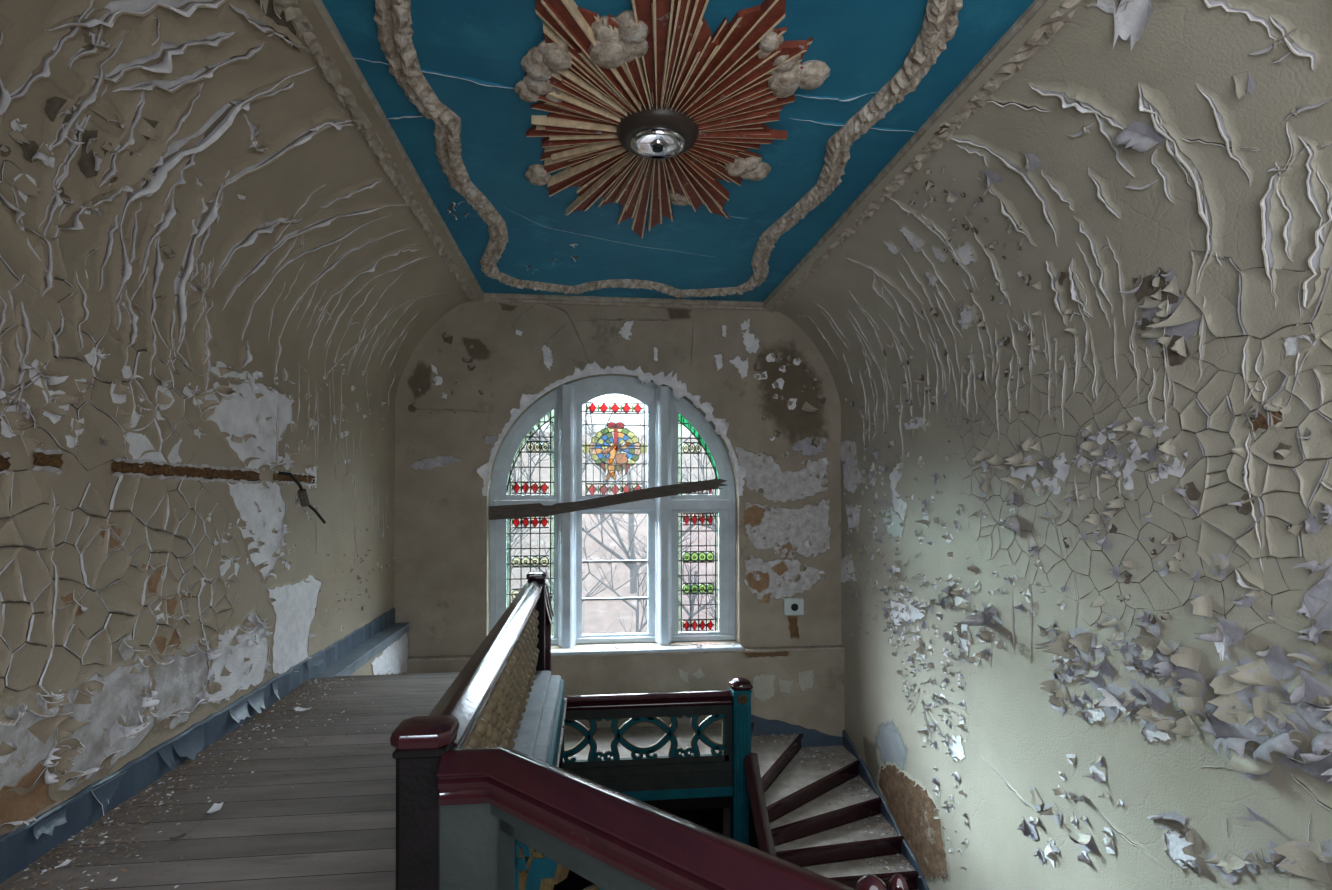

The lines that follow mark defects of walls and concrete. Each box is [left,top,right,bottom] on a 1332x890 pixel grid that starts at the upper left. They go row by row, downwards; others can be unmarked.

peeling [0,96,164,215]
crack [0,0,448,695]
peeling [408,332,476,414]
peeling [616,317,637,344]
peeling [711,318,826,414]
crack [790,0,1332,666]